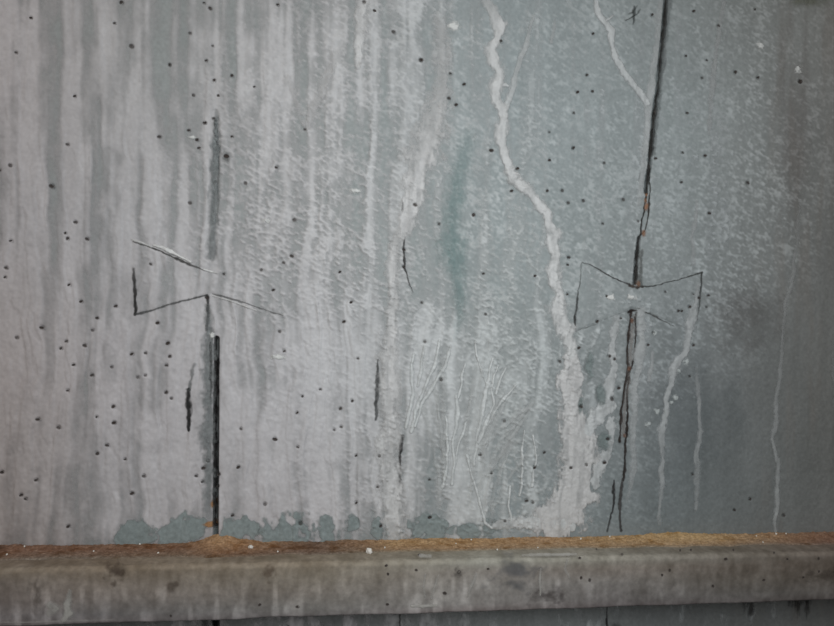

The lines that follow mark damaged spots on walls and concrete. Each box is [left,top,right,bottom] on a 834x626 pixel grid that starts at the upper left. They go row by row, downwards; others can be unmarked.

efflorescence [354,0,369,69]
efflorescence [594,0,659,182]
crack [634,0,667,284]
crack [186,295,219,527]
leakage [375,60,451,540]
leakage [438,0,619,538]
crack [607,309,638,532]
efflorescence [631,291,699,489]
efflorescence [694,400,702,463]
efflorescence [771,360,783,532]